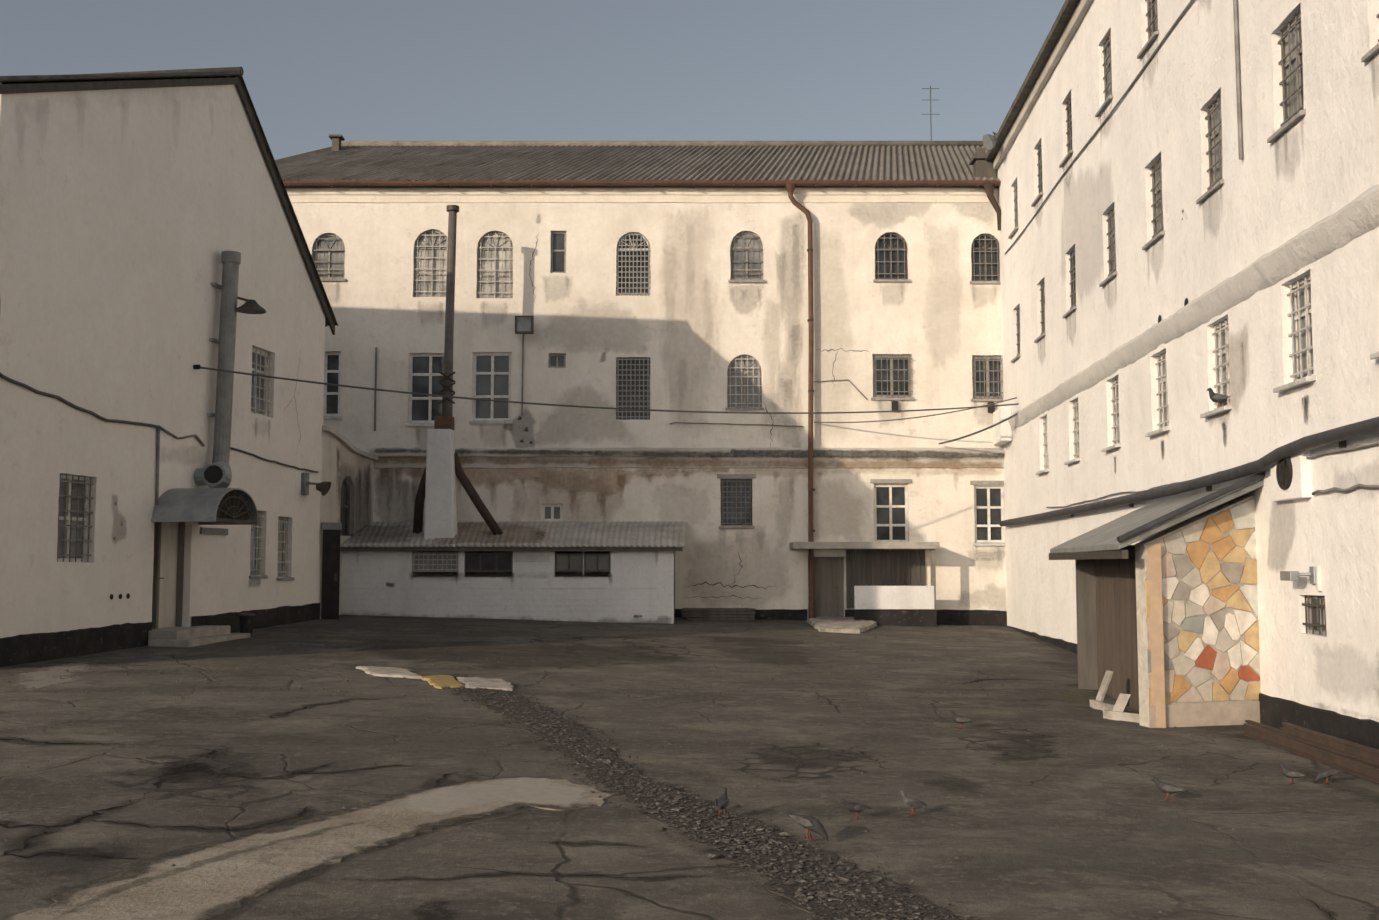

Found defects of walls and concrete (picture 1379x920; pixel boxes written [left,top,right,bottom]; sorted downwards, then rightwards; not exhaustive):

crack [684,552,771,599]